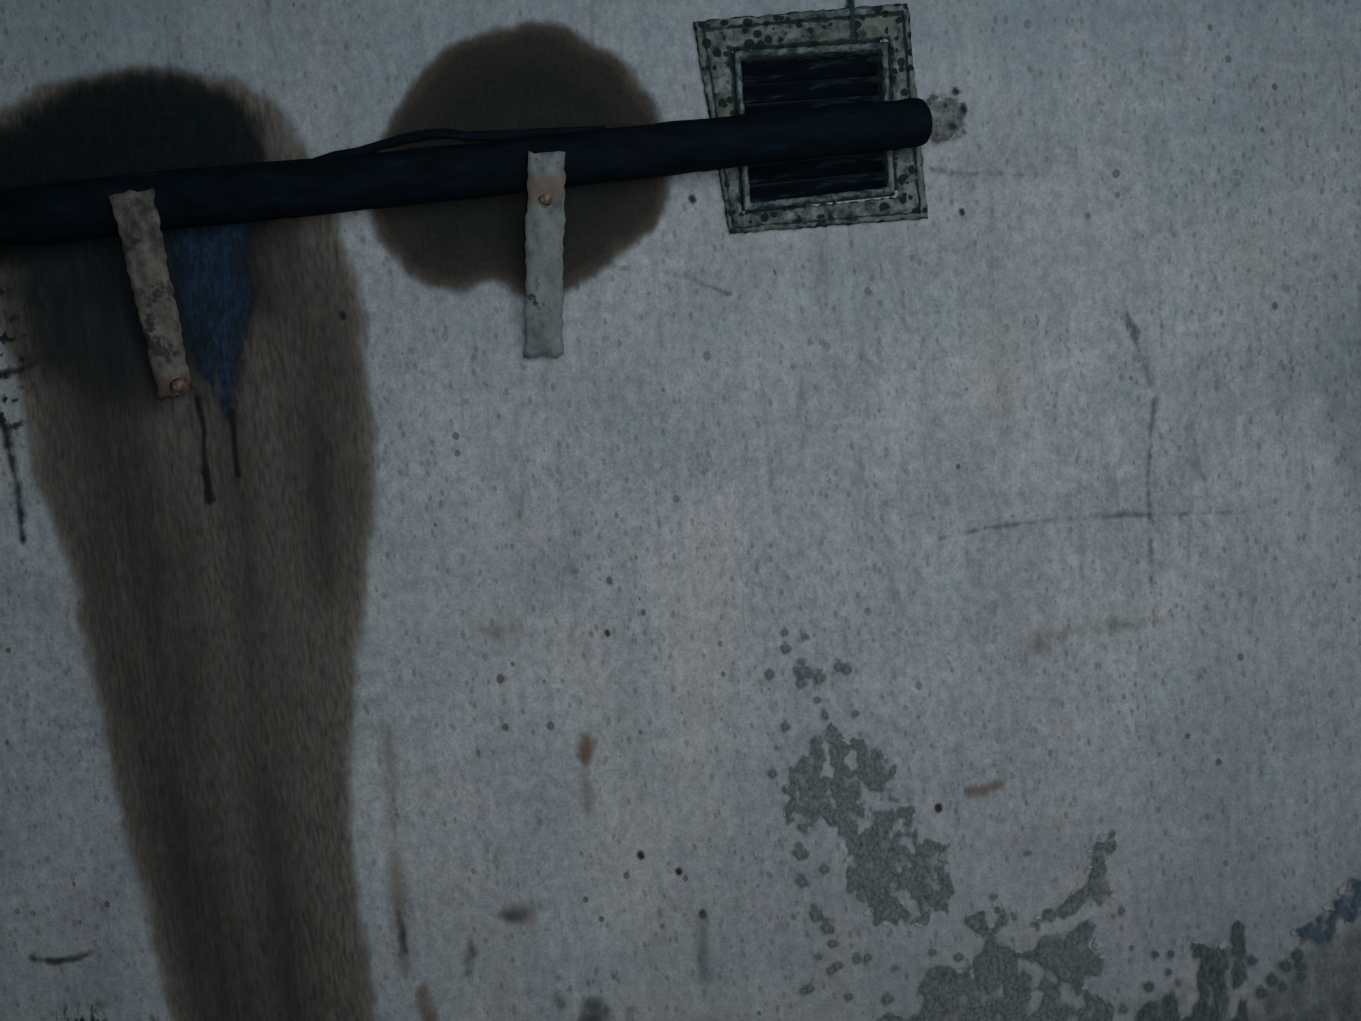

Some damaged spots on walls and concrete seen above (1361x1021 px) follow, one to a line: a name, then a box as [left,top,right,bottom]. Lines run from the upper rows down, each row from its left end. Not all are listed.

crack [846,0,855,38]
water stain [0,69,308,192]
water stain [378,23,659,152]
water stain [371,192,528,296]
water stain [562,176,668,291]
crack [0,288,50,543]
water stain [0,214,375,1021]
peeling [769,628,955,926]
peeling [809,904,872,975]
peeling [878,831,1361,1021]